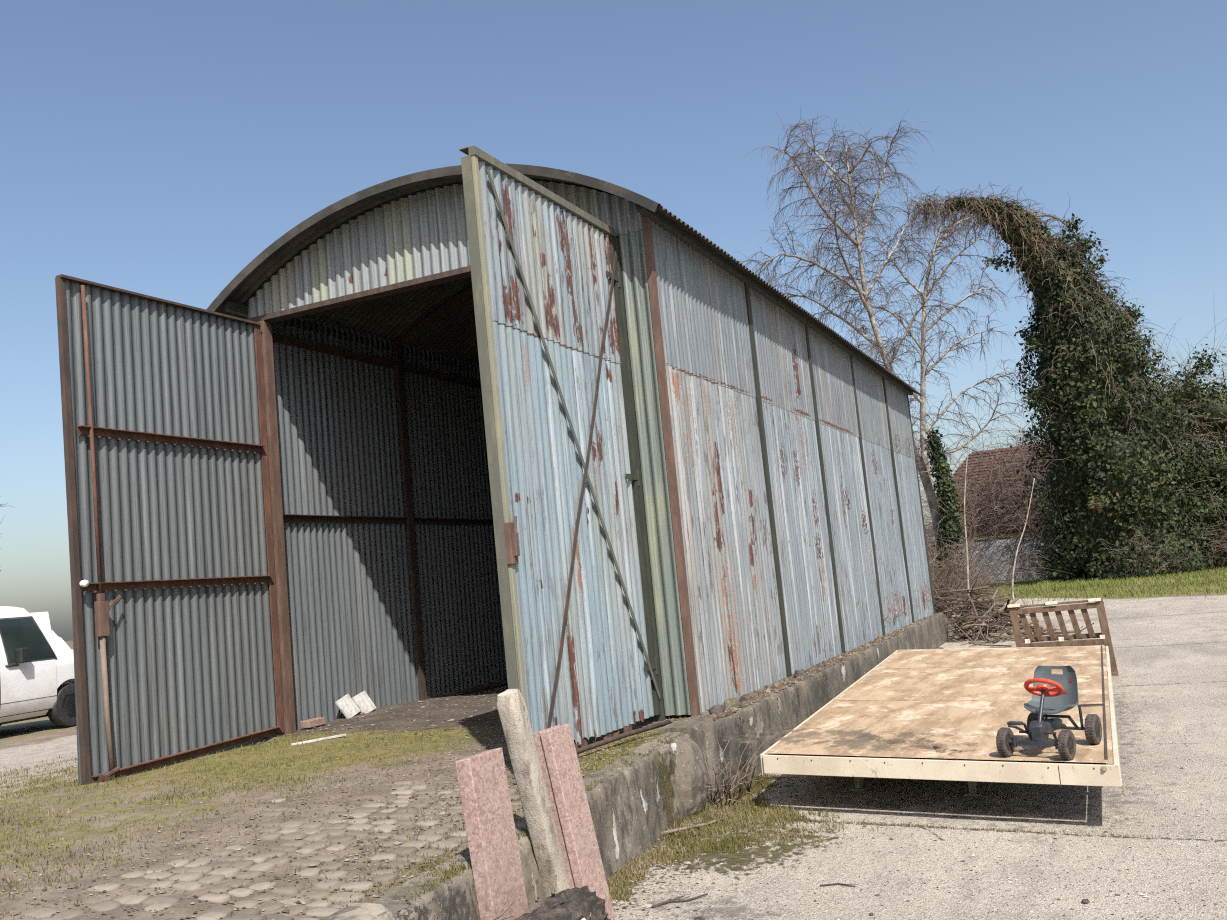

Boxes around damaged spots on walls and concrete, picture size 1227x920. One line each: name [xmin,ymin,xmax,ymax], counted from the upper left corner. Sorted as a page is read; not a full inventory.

rust [496,179,620,382]
rust [792,345,853,434]
rust [712,436,740,690]
rust [778,442,801,484]
rust [812,492,823,561]
rust [566,621,644,749]